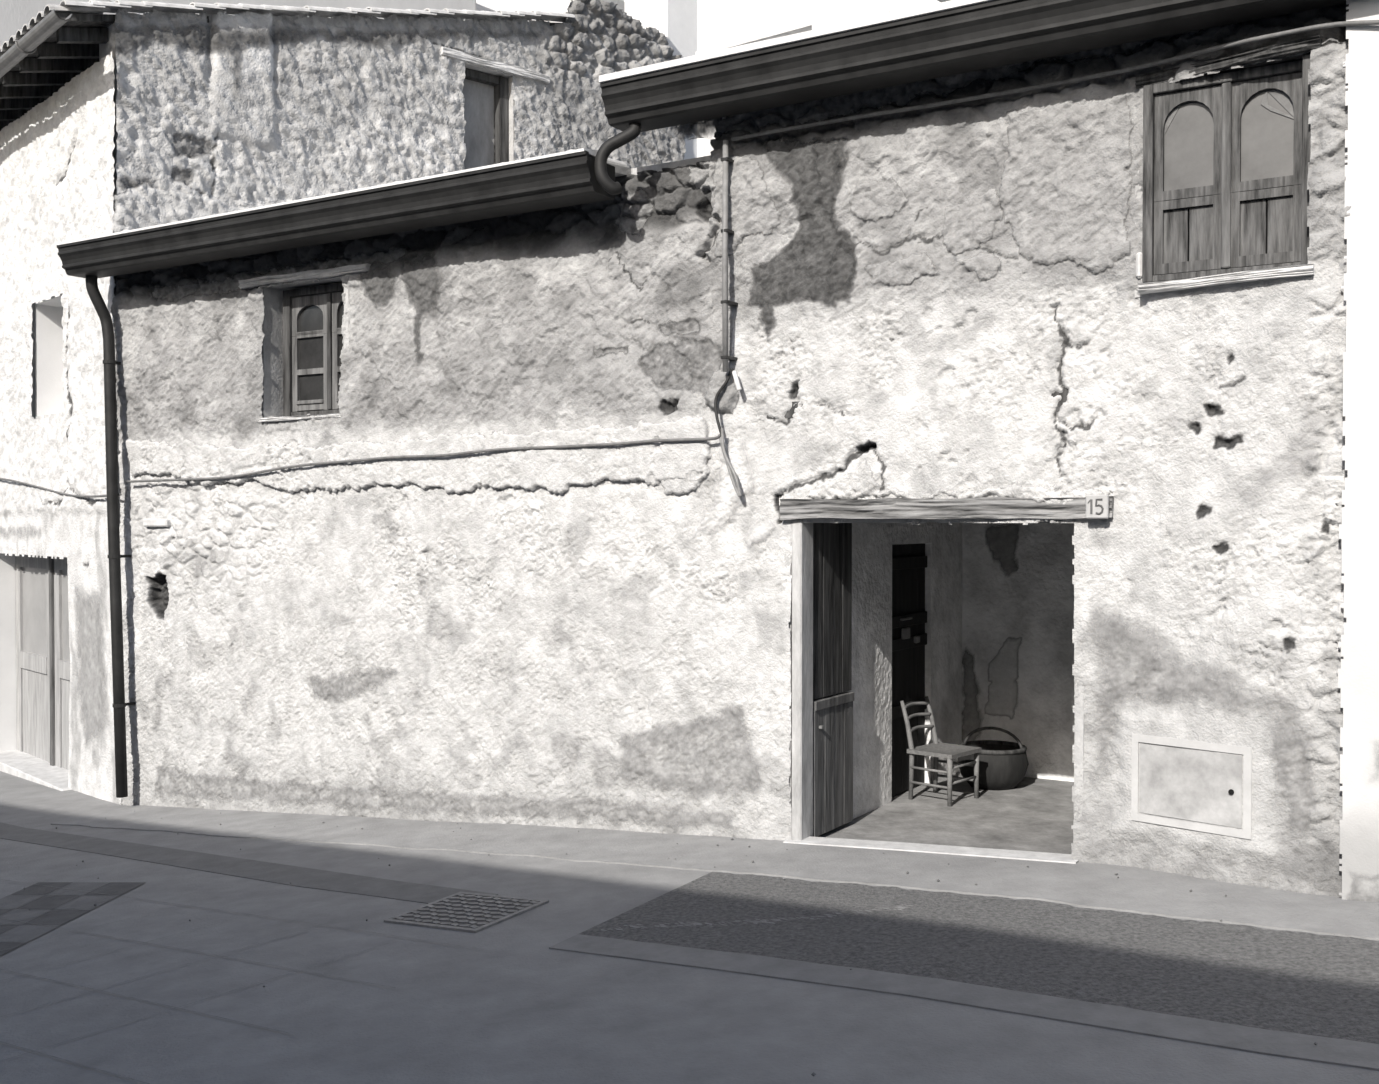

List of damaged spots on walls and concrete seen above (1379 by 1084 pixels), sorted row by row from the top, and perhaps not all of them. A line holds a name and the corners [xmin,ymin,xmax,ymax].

spalling [675,28,1208,139]
spalling [171,134,211,185]
flaking render [689,155,781,260]
flaking render [942,94,1142,281]
spalling [593,318,723,415]
crack [771,404,845,425]
crack [1054,308,1095,475]
crack [788,450,887,492]